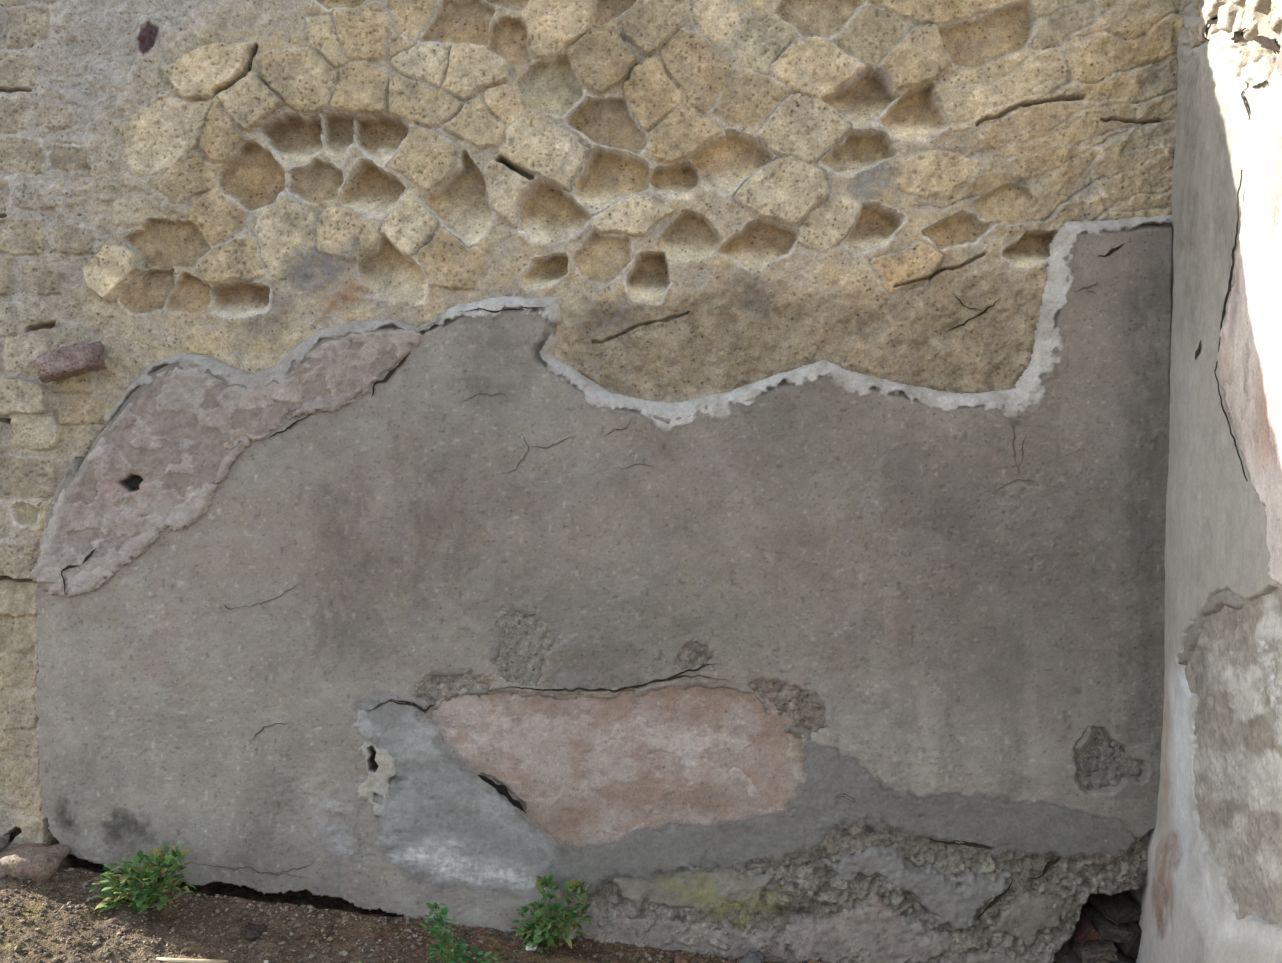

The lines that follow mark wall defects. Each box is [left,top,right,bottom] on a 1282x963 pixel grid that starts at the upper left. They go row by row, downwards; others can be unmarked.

peeling [30,328,422,598]
spalling [1178,101,1282,928]
peeling [354,709,397,820]
crack [477,775,526,813]
crack [488,663,726,693]
spalling [415,602,827,851]
spalling [1074,726,1145,790]
crack [194,863,313,879]
spalling [575,821,1152,963]